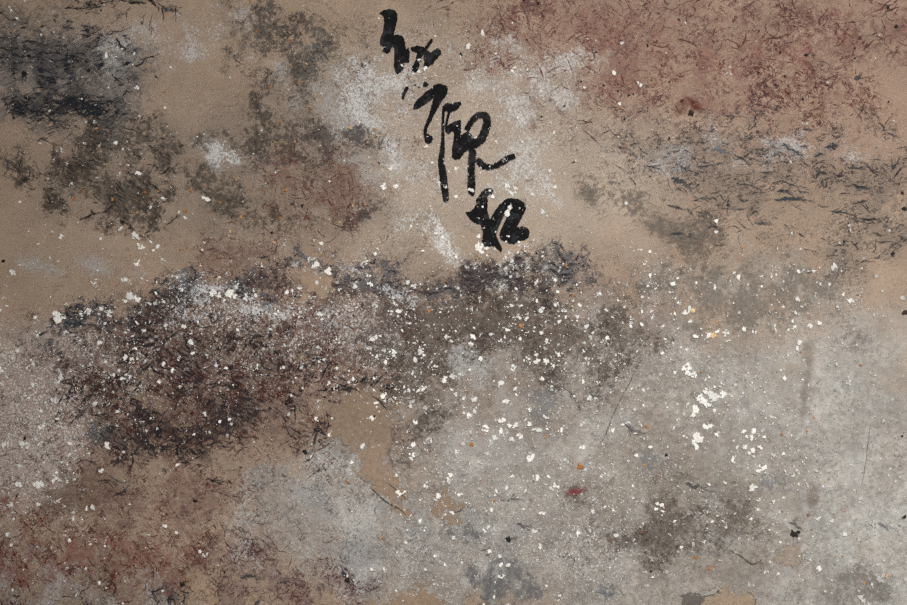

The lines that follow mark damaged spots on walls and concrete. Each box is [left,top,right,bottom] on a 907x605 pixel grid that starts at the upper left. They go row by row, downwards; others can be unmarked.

damp [0,0,667,605]
damp [600,491,758,570]